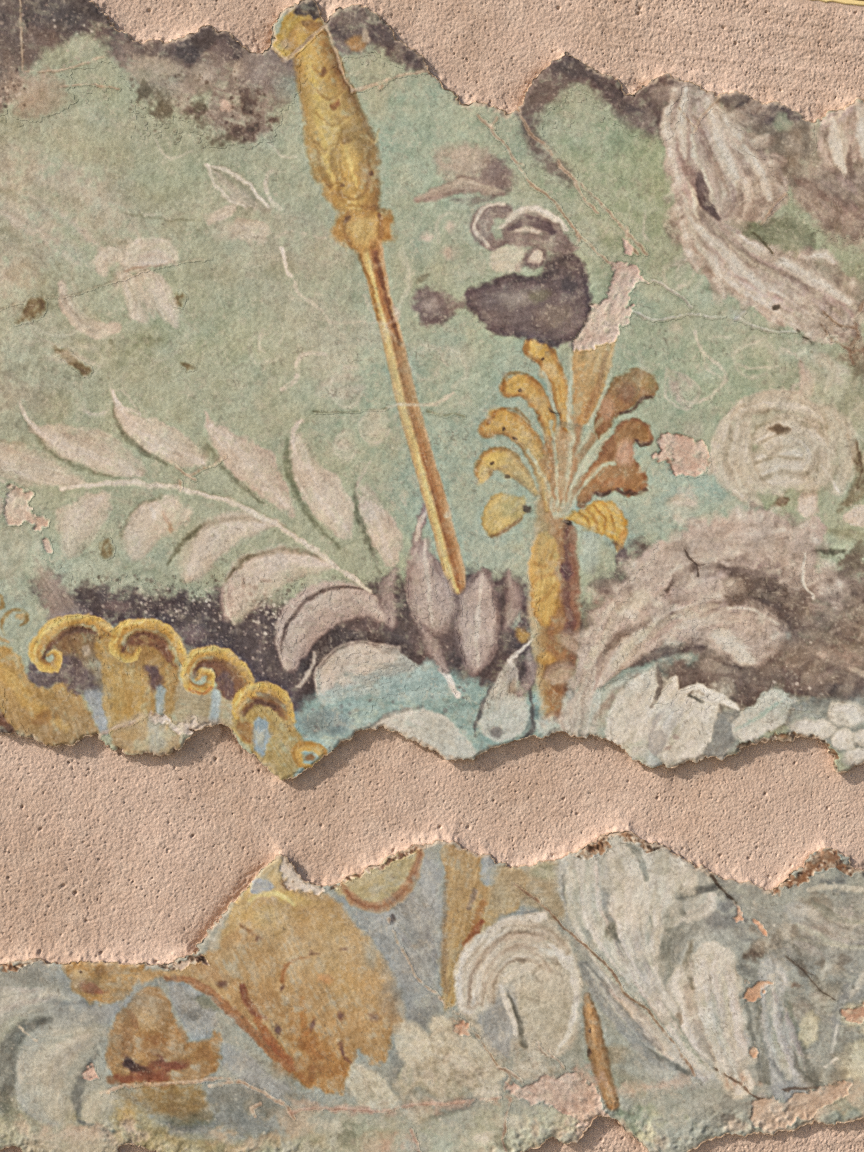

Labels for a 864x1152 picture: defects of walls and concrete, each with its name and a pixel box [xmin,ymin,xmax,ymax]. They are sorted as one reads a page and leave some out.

spalling [571,236,653,353]
spalling [650,431,711,478]
spalling [0,482,53,555]
spalling [148,708,216,736]
spalling [736,730,841,772]
spalling [278,844,426,896]
spalling [574,831,662,861]
spalling [766,848,863,898]
spalling [0,959,40,974]
spalling [158,953,210,971]
crack [513,883,818,1099]
spalling [503,1071,610,1142]